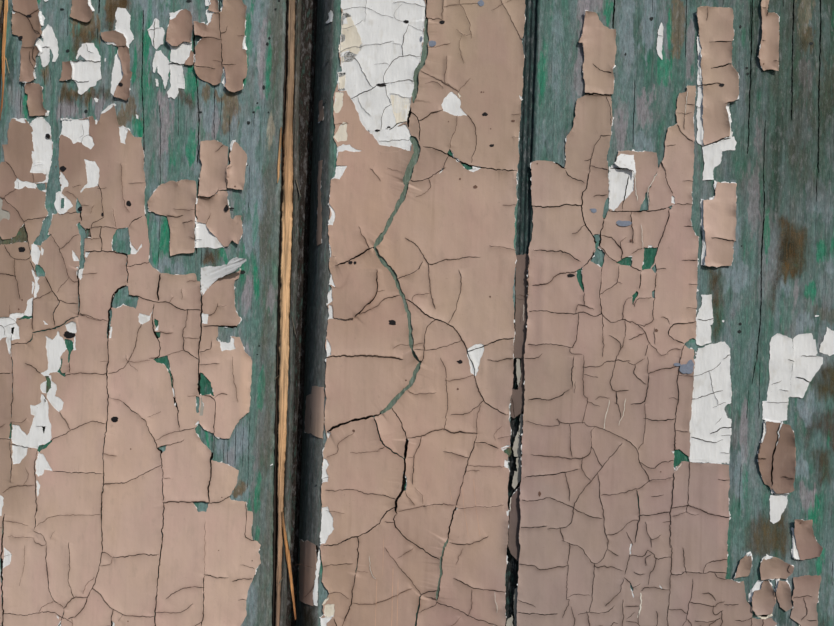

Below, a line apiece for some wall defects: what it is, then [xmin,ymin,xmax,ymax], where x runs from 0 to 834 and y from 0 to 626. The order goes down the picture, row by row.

peeling [0,0,134,354]
peeling [147,140,247,256]
peeling [148,0,248,99]
peeling [318,0,426,151]
peeling [696,6,739,268]
peeling [758,0,780,71]
peeling [9,321,77,496]
crack [0,162,255,626]
crack [322,0,764,626]
peeling [672,294,732,471]
peeling [756,327,834,524]
peeling [734,519,823,619]